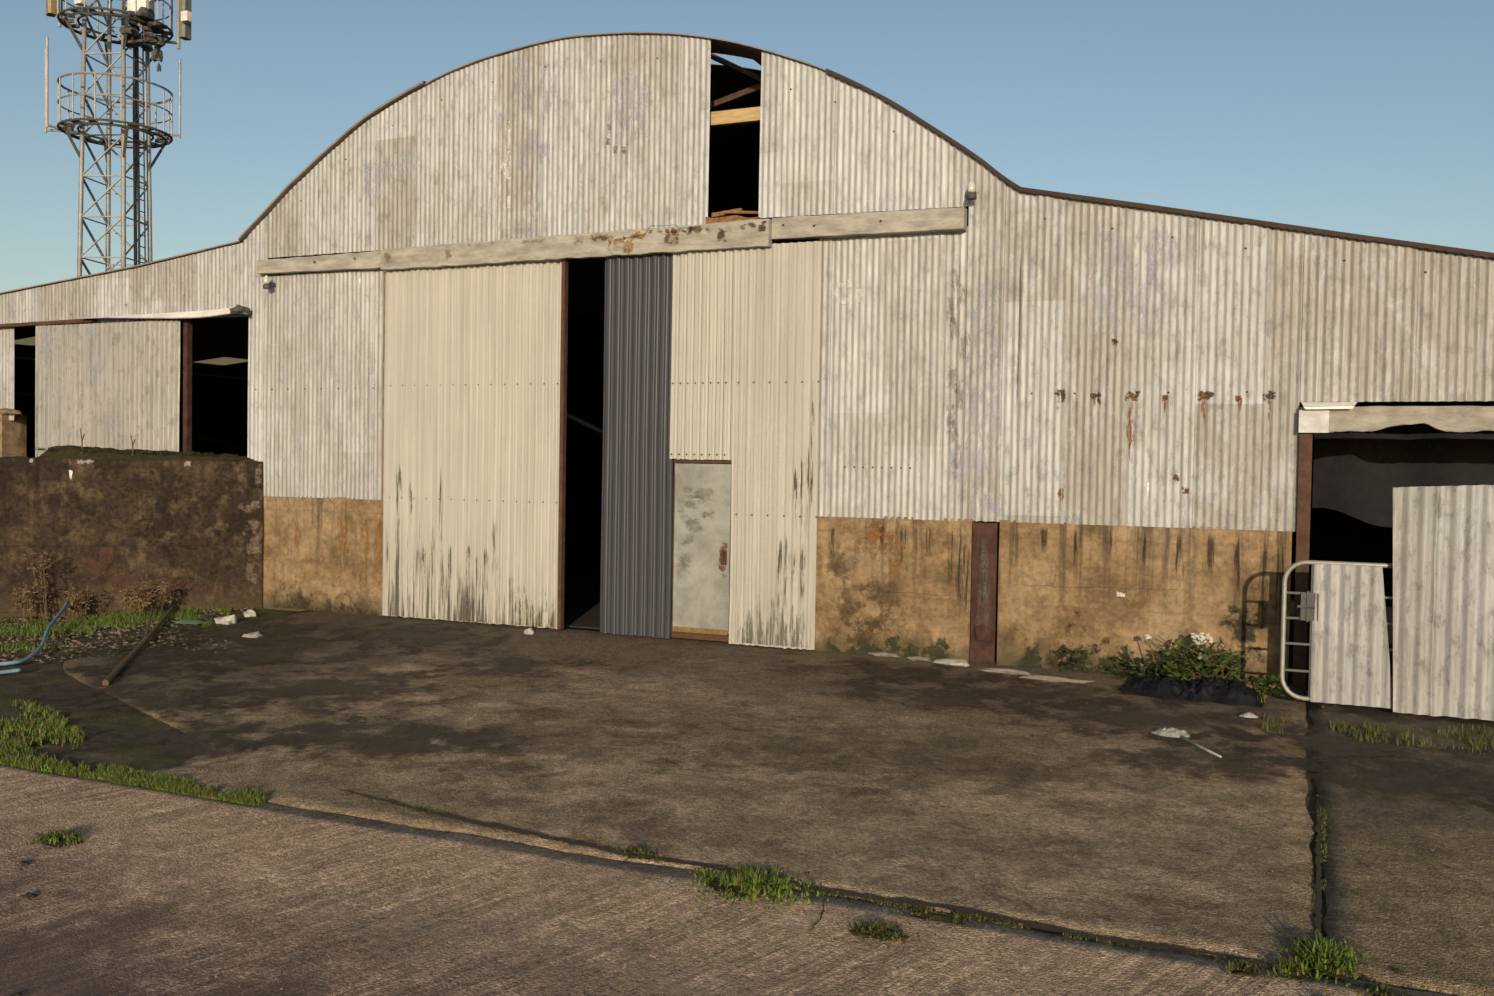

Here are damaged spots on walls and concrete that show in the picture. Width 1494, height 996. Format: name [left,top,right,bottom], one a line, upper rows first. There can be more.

water stain [794,404,814,507]
rust [1125,391,1141,454]
rust [1198,391,1214,420]
water stain [275,530,514,625]
water stain [742,544,805,648]
water stain [948,539,969,602]
water stain [1259,547,1284,613]